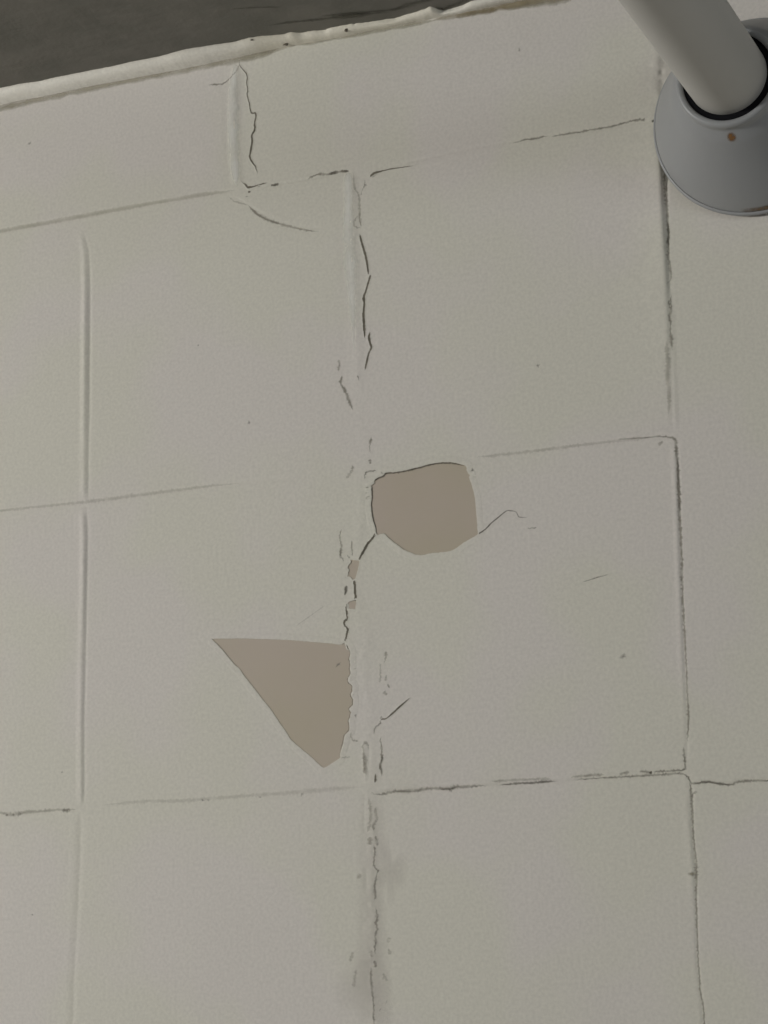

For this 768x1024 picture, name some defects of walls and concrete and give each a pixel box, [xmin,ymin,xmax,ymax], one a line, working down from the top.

crack [213,60,278,193]
crack [311,165,415,177]
crack [339,234,374,408]
peeling [365,456,484,562]
crack [340,533,378,650]
peeling [207,632,359,774]